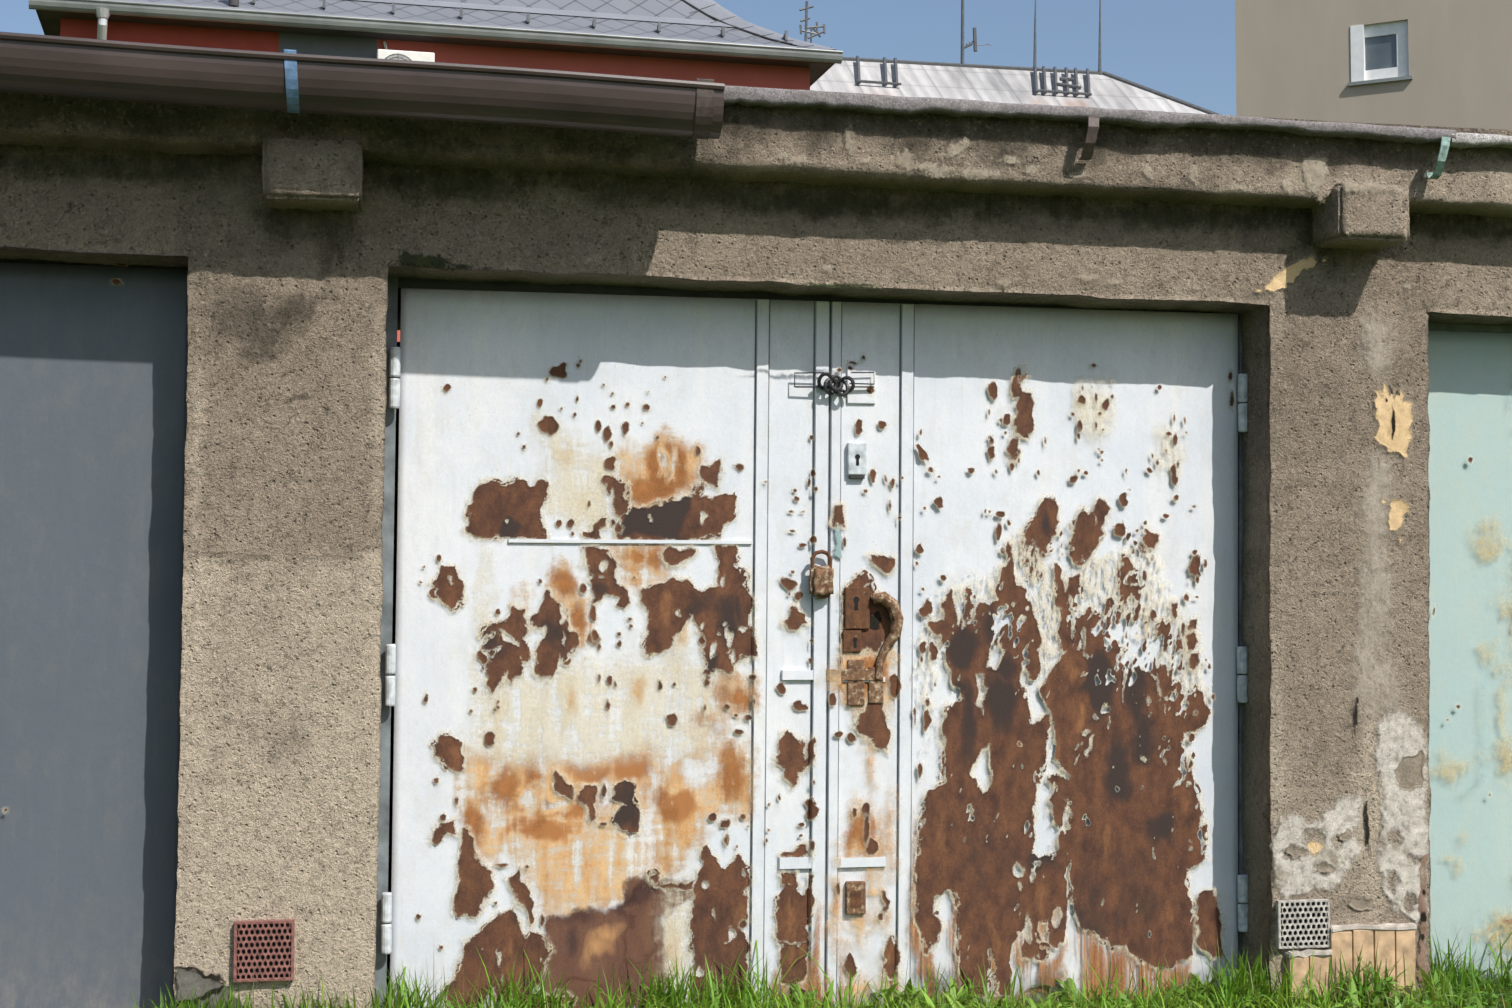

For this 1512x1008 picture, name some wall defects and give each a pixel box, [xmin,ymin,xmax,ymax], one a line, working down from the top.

peeling [1256,256,1326,293]
rust [537,360,582,435]
rust [968,365,1047,474]
peeling [1374,383,1416,457]
peeling [1380,499,1410,543]
rust [419,554,469,612]
rust [429,381,1225,1008]
spalling [1272,711,1430,982]